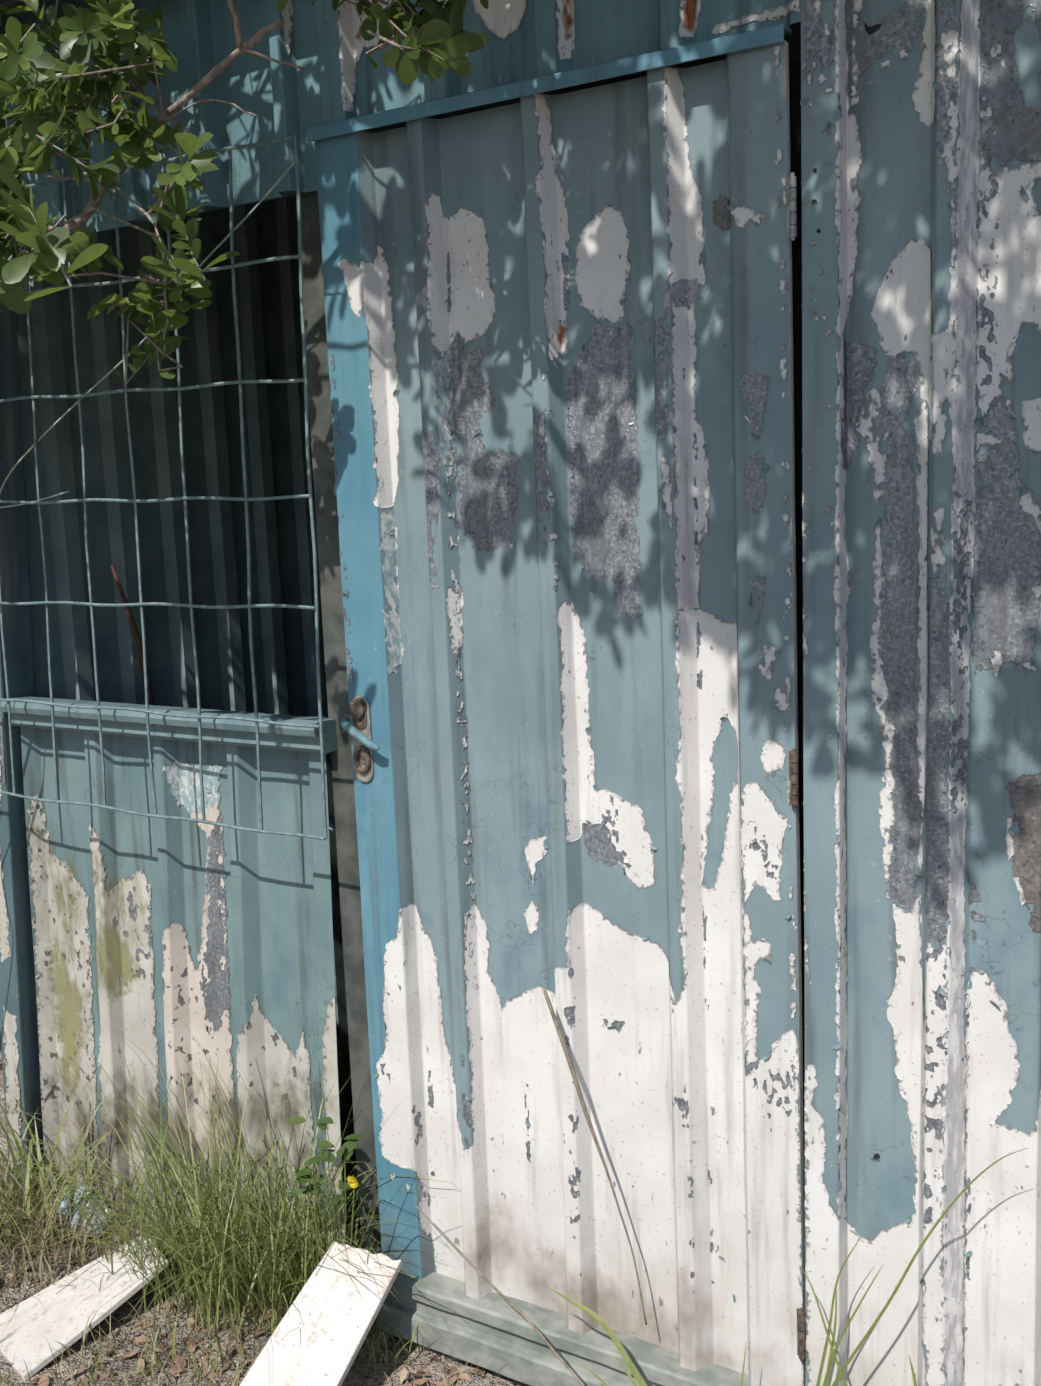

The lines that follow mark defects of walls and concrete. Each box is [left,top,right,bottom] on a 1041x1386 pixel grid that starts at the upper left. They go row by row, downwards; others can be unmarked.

peeling [337,0,397,112]
rust [564,0,573,38]
rust [684,0,697,31]
peeling [338,246,404,686]
peeling [374,0,1041,1386]
peeling [0,848,11,963]
peeling [3,1006,23,1169]
peeling [26,761,345,1252]